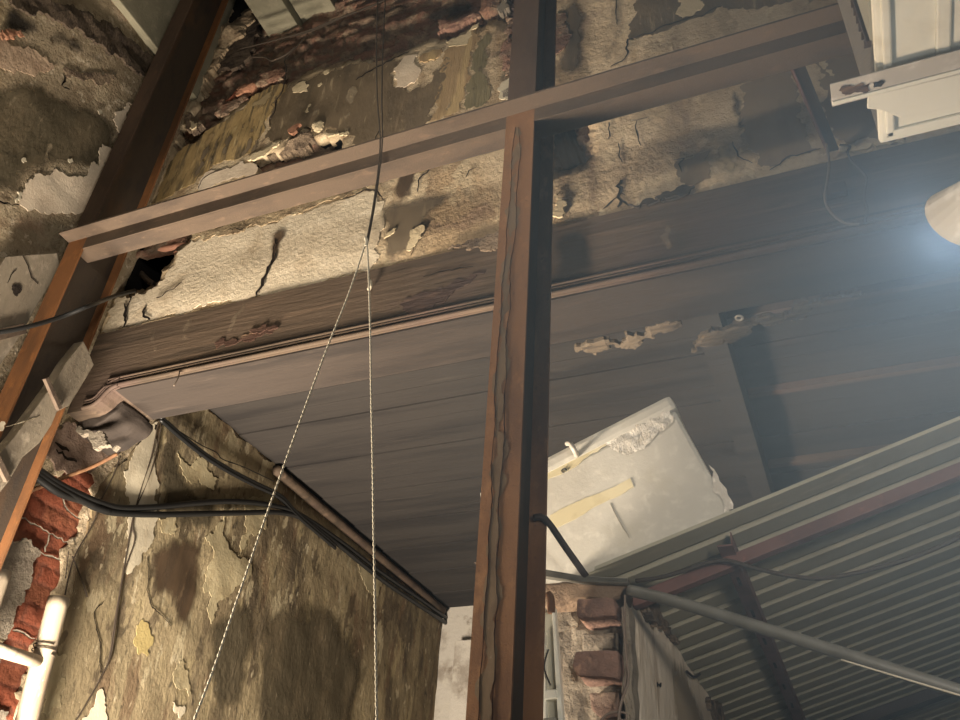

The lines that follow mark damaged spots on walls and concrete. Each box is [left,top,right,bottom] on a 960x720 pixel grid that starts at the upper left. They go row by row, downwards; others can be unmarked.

flaking render [184,0,514,146]
crack [610,0,721,67]
damp [0,85,113,193]
spalling [247,104,349,172]
crack [603,117,647,209]
crack [256,240,278,296]
rust [479,127,521,720]
damp [163,446,213,526]
flaking render [3,488,83,651]
damp [154,541,199,622]
flaking render [0,659,28,720]
damp [209,608,360,720]